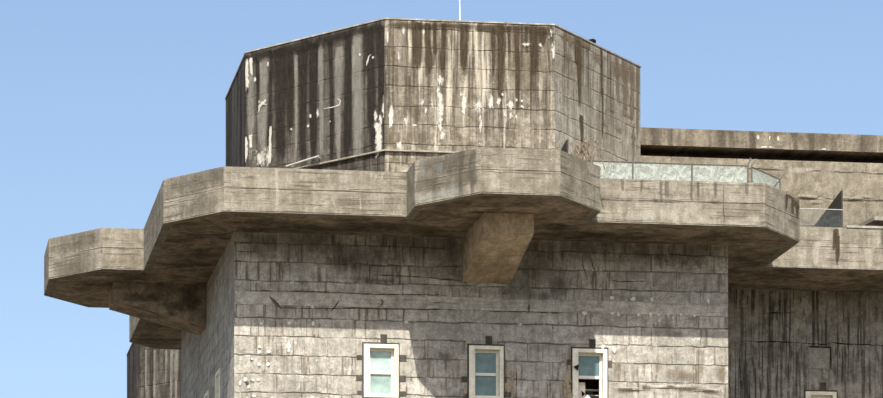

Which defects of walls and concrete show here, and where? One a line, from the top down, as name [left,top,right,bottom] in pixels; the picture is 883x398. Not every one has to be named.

peeling [245,58,256,89]
leakage [246,22,549,157]
peeling [245,126,272,166]